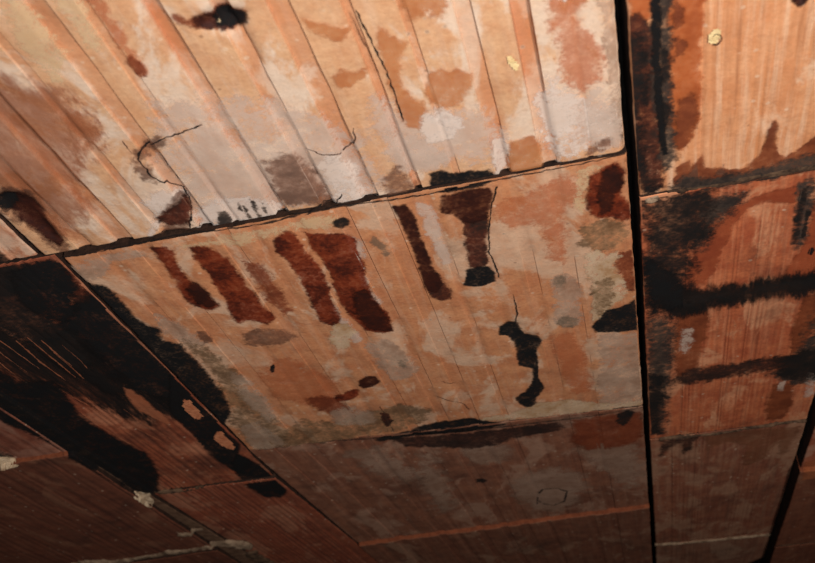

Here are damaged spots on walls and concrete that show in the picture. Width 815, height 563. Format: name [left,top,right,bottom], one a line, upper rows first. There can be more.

damp [0,0,100,236]
corrosion [150,246,292,324]
damp [146,96,510,227]
corrosion [273,217,392,333]
crack [62,124,624,278]
corrosion [392,204,453,301]
damp [418,203,452,264]
corrosion [441,188,495,287]
damp [503,167,589,261]
damp [533,0,624,158]
damp [629,0,815,435]
damp [0,216,647,513]